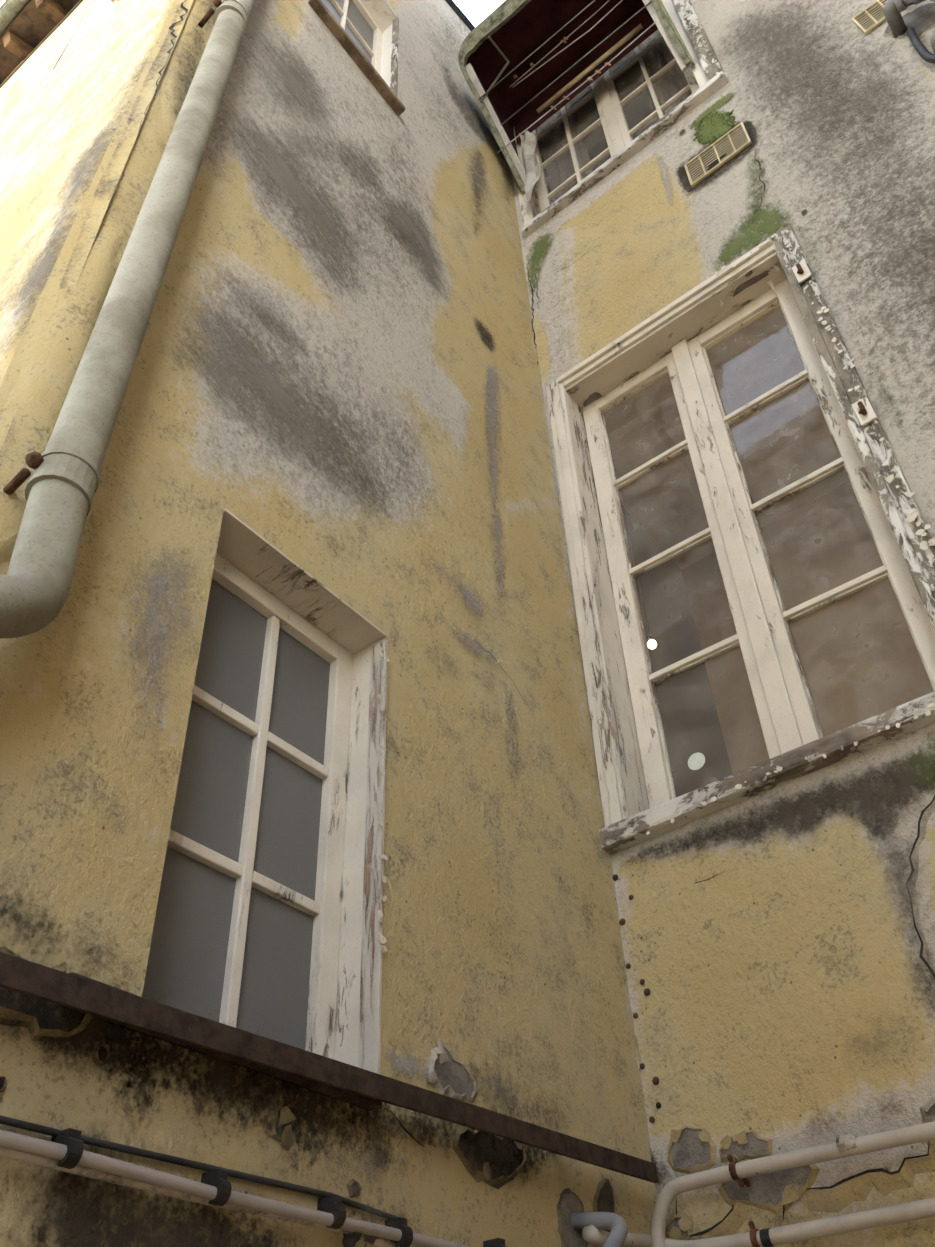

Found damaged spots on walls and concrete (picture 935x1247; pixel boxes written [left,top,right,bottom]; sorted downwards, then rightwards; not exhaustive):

crack [138,0,188,133]
damp [236,43,356,287]
peeling [803,281,855,369]
peeling [882,460,935,551]
damp [628,754,935,916]
crack [906,795,935,978]
damp [0,987,559,1179]
damp [27,1170,296,1247]
crack [676,1197,748,1240]
flaking render [668,1126,772,1174]
flaking render [718,1164,820,1215]
crack [783,1141,935,1219]